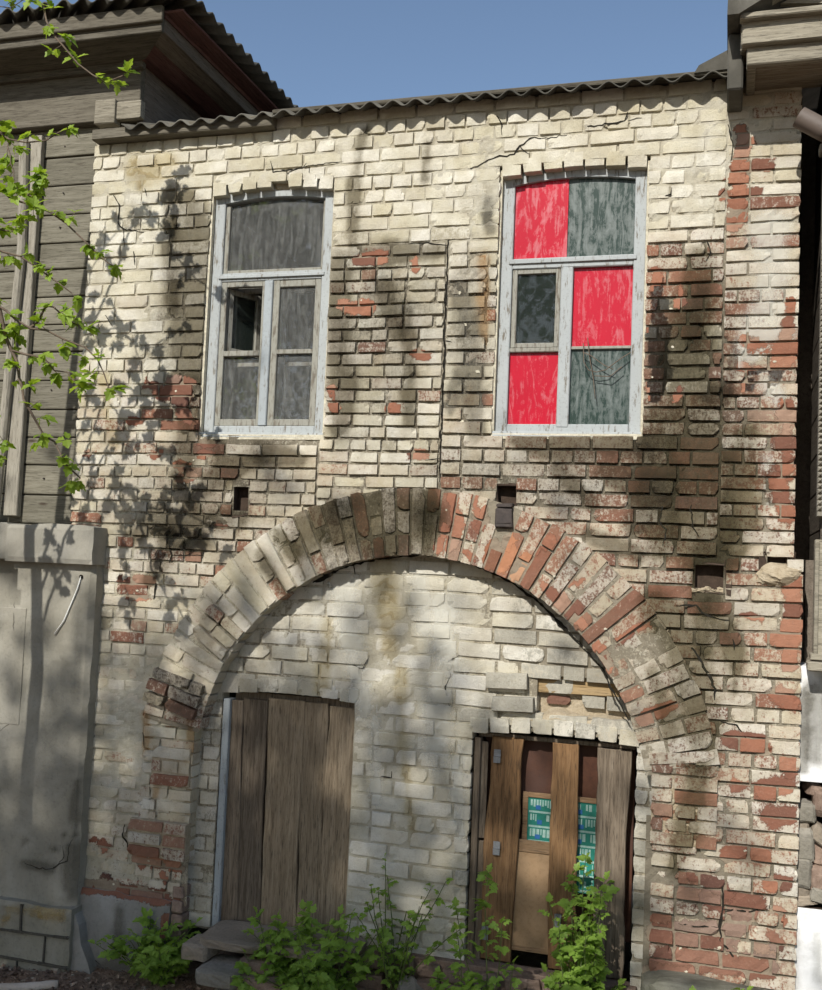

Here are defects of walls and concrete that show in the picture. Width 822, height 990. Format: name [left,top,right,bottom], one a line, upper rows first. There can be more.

crack [470,112,637,169]
peeling [718,122,776,233]
peeling [126,415,146,427]
peeling [142,374,197,426]
peeling [149,444,164,460]
peeling [172,437,217,484]
spalling [116,573,156,603]
peeling [720,729,799,831]
crack [25,839,73,870]
spalling [89,836,112,854]
spalling [80,855,187,939]
spalling [642,843,795,984]